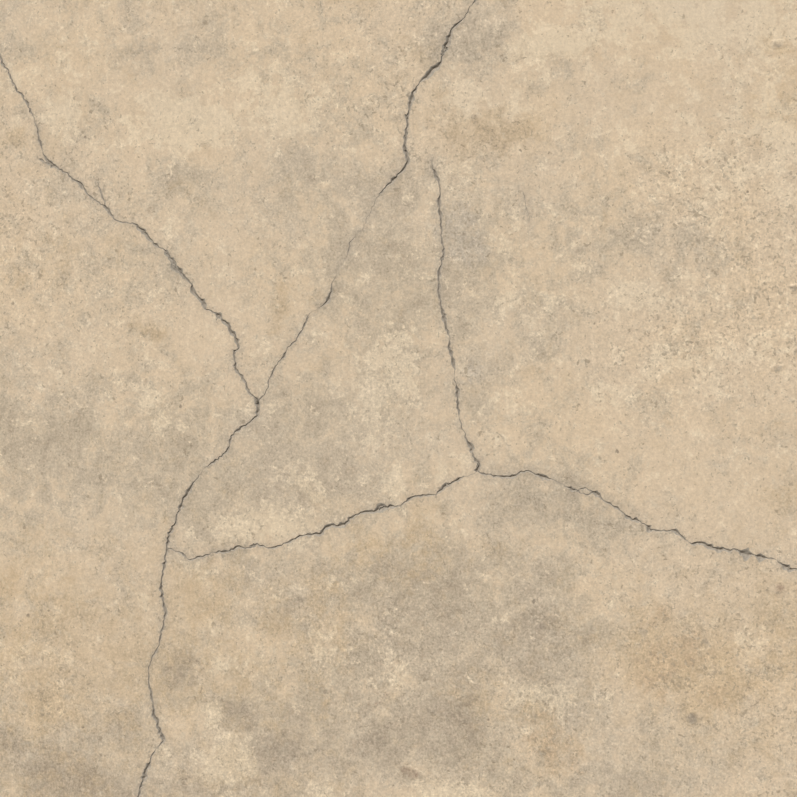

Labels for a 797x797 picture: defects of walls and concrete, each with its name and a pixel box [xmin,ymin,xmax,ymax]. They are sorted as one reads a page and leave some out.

crack [0,54,313,467]
crack [363,0,476,228]
crack [137,162,797,797]